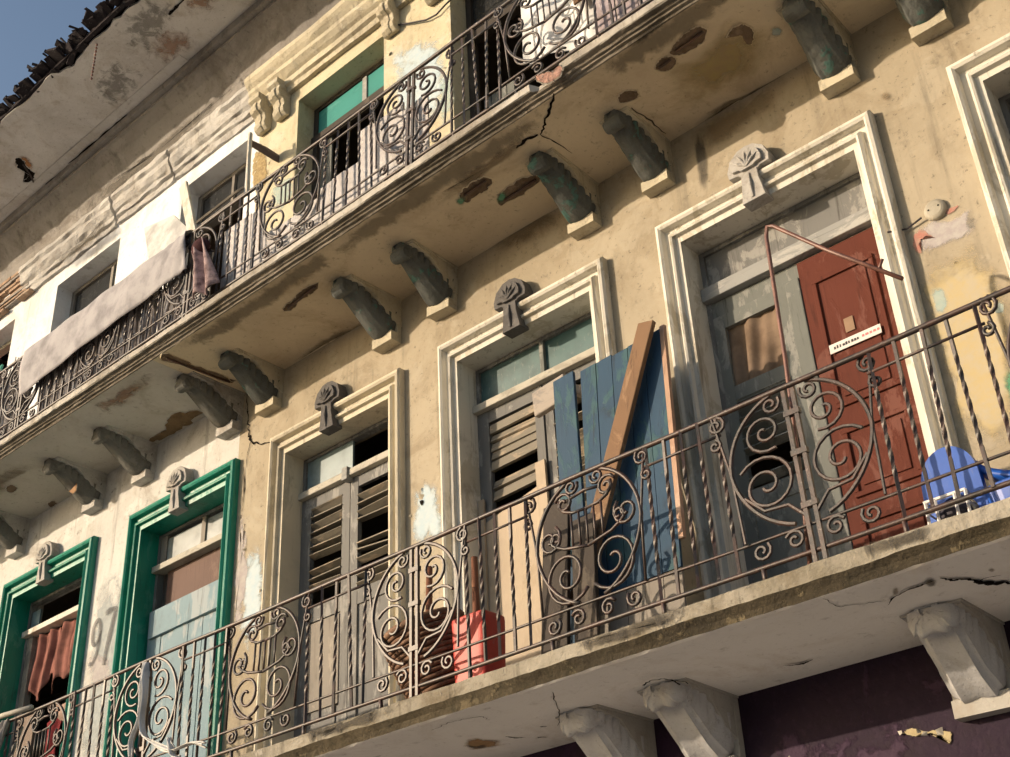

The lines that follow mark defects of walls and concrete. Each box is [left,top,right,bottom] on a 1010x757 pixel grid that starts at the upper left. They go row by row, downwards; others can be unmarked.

spalling [0,0,136,117]
spalling [654,25,708,72]
spalling [725,23,756,45]
crack [516,93,571,153]
spalling [14,157,36,183]
spalling [457,175,541,206]
flaking render [0,270,35,319]
spalling [148,410,203,442]
crack [241,399,270,512]
peeling [408,486,442,540]
crack [825,575,1010,607]
peeling [898,727,951,744]